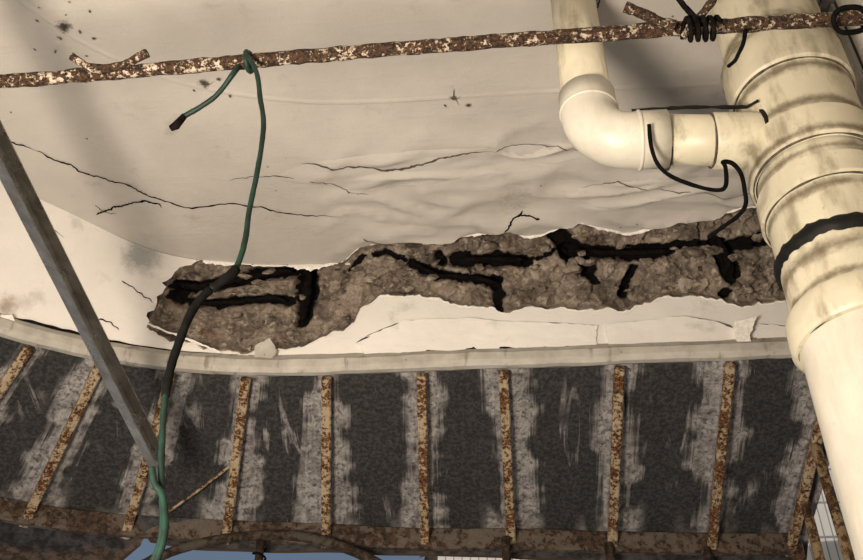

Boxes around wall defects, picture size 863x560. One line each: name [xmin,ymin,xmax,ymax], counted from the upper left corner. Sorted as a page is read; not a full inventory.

crack [12,142,331,217]
crack [230,175,368,195]
crack [505,211,540,233]
leakage [128,244,155,265]
spalling [146,206,786,358]